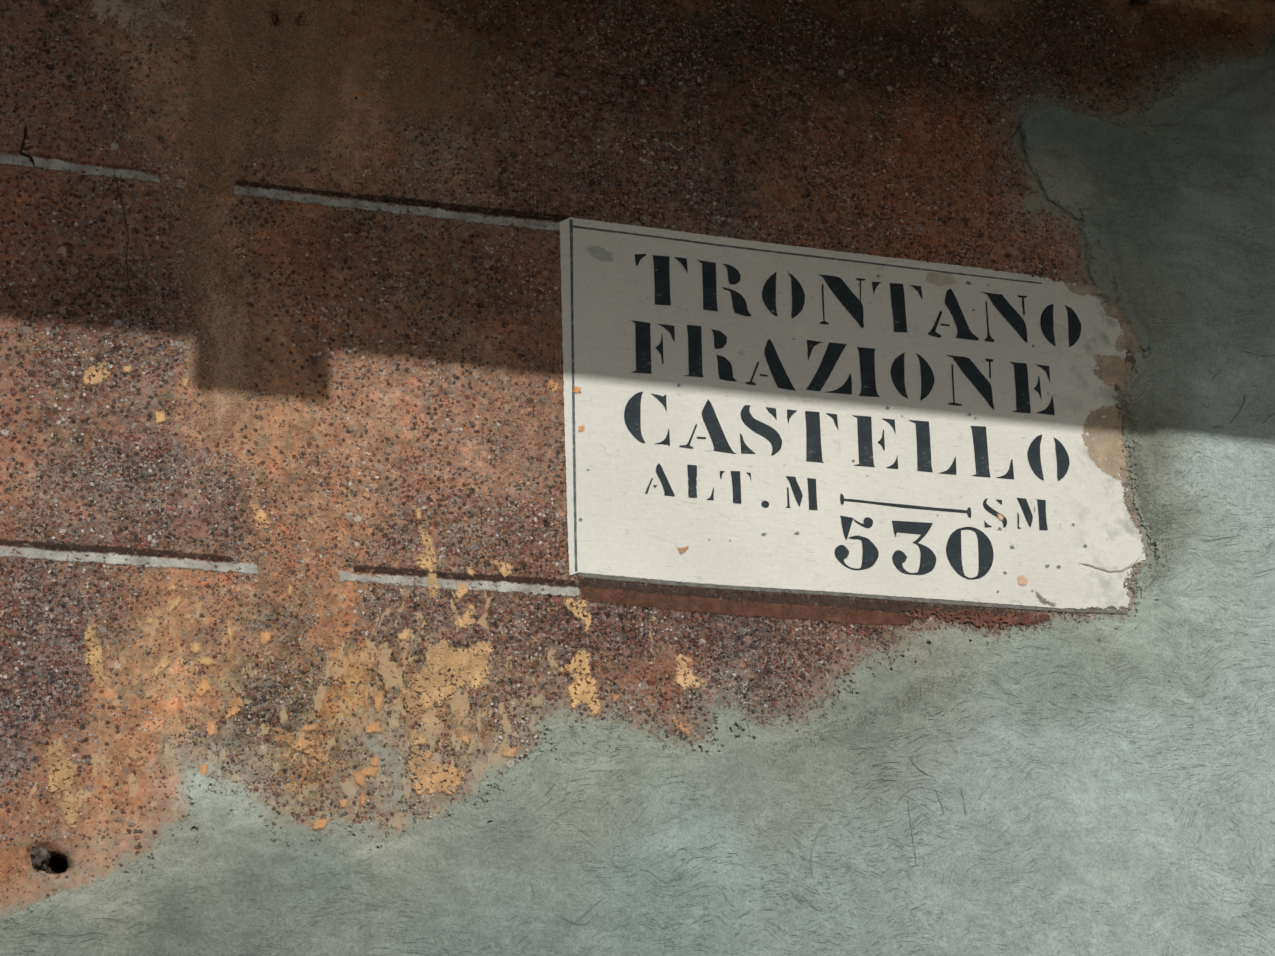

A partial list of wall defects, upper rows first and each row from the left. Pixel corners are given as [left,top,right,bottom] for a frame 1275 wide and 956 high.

flaking render [1064,282,1142,482]
peeling [416,509,440,598]
peeling [455,568,477,628]
peeling [490,560,513,577]
peeling [563,598,591,631]
peeling [190,624,233,696]
peeling [400,641,494,715]
peeling [560,650,619,714]
peeling [674,654,705,690]
peeling [206,697,243,736]
peeling [271,724,331,762]
peeling [407,731,465,795]